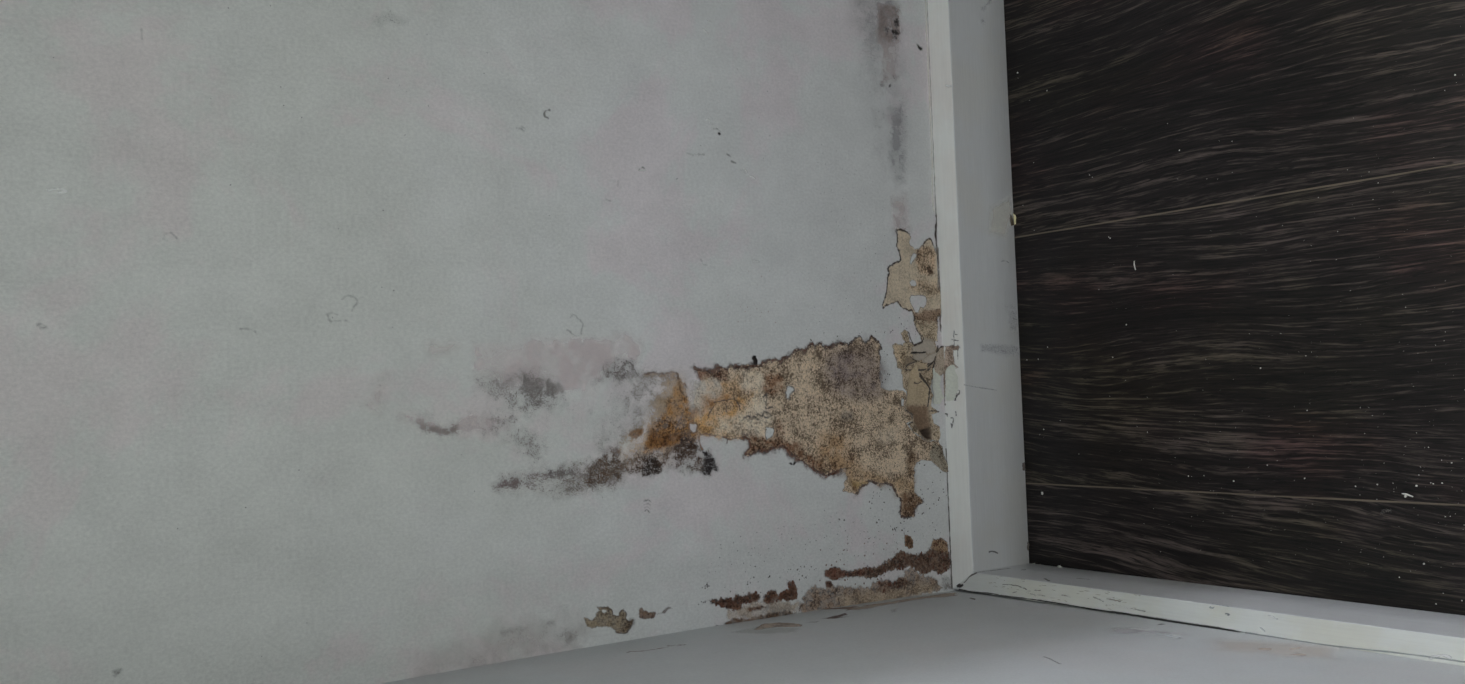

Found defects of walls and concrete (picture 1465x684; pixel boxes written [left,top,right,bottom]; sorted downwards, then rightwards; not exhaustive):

damp [853,0,904,179]
damp [406,341,717,497]
peeling [683,229,960,532]
peeling [584,607,670,634]